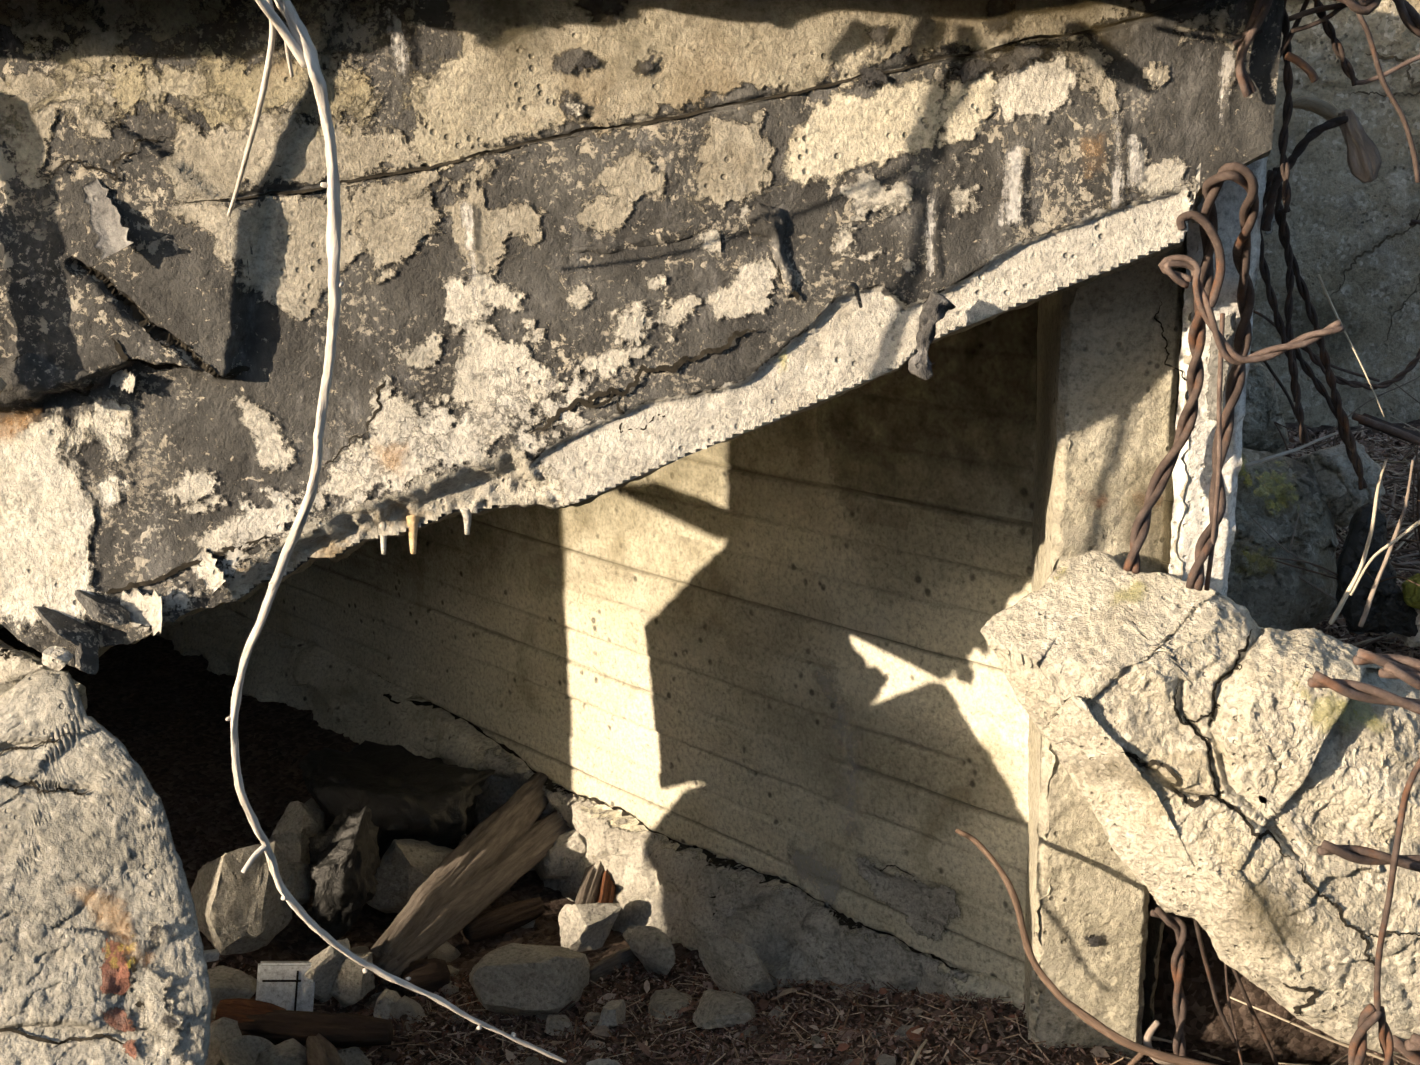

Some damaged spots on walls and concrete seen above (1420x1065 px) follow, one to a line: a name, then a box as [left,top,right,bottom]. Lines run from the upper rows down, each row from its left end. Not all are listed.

crack [186,0,1186,203]
peeling [1175,1,1237,89]
crack [1351,52,1420,97]
crack [1325,209,1420,297]
crack [79,264,250,379]
peeling [0,0,1198,617]
flaking render [1206,311,1237,421]
crack [1378,274,1420,350]
crack [1121,629,1420,968]
spalling [472,746,969,1001]
crack [1283,983,1320,1015]